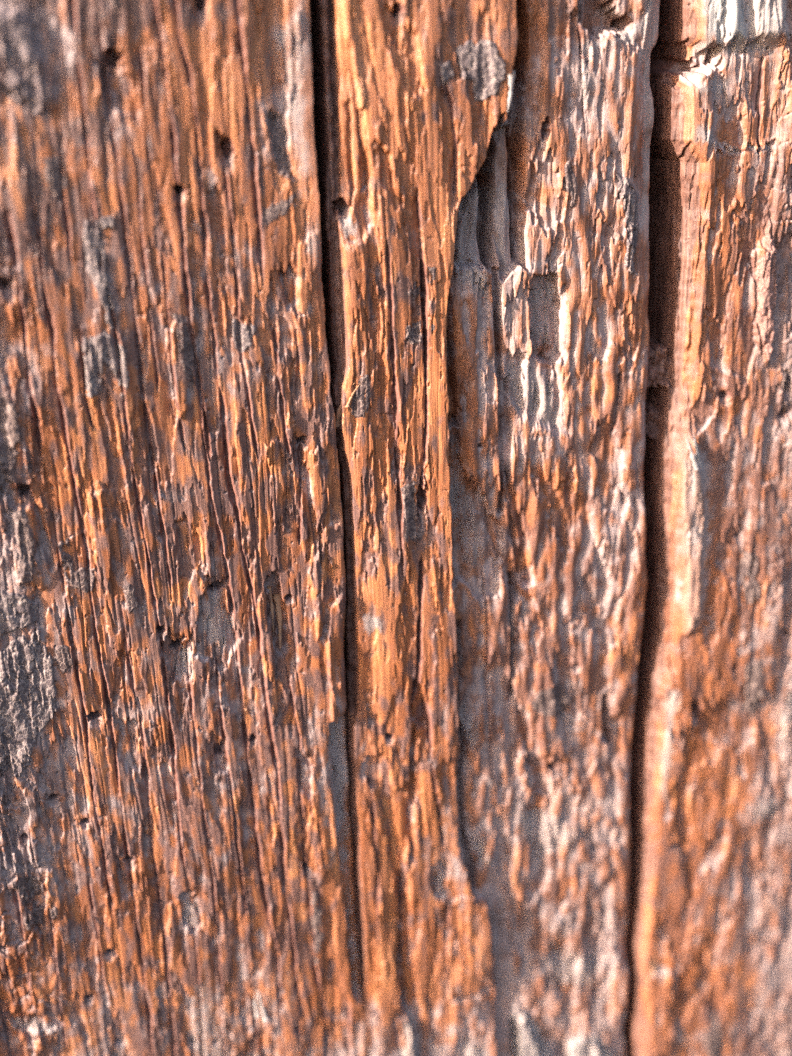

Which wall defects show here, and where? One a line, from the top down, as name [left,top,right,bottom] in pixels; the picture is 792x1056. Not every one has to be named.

peeling [0,0,59,117]
peeling [0,393,20,486]
peeling [0,509,73,777]
peeling [11,874,57,931]